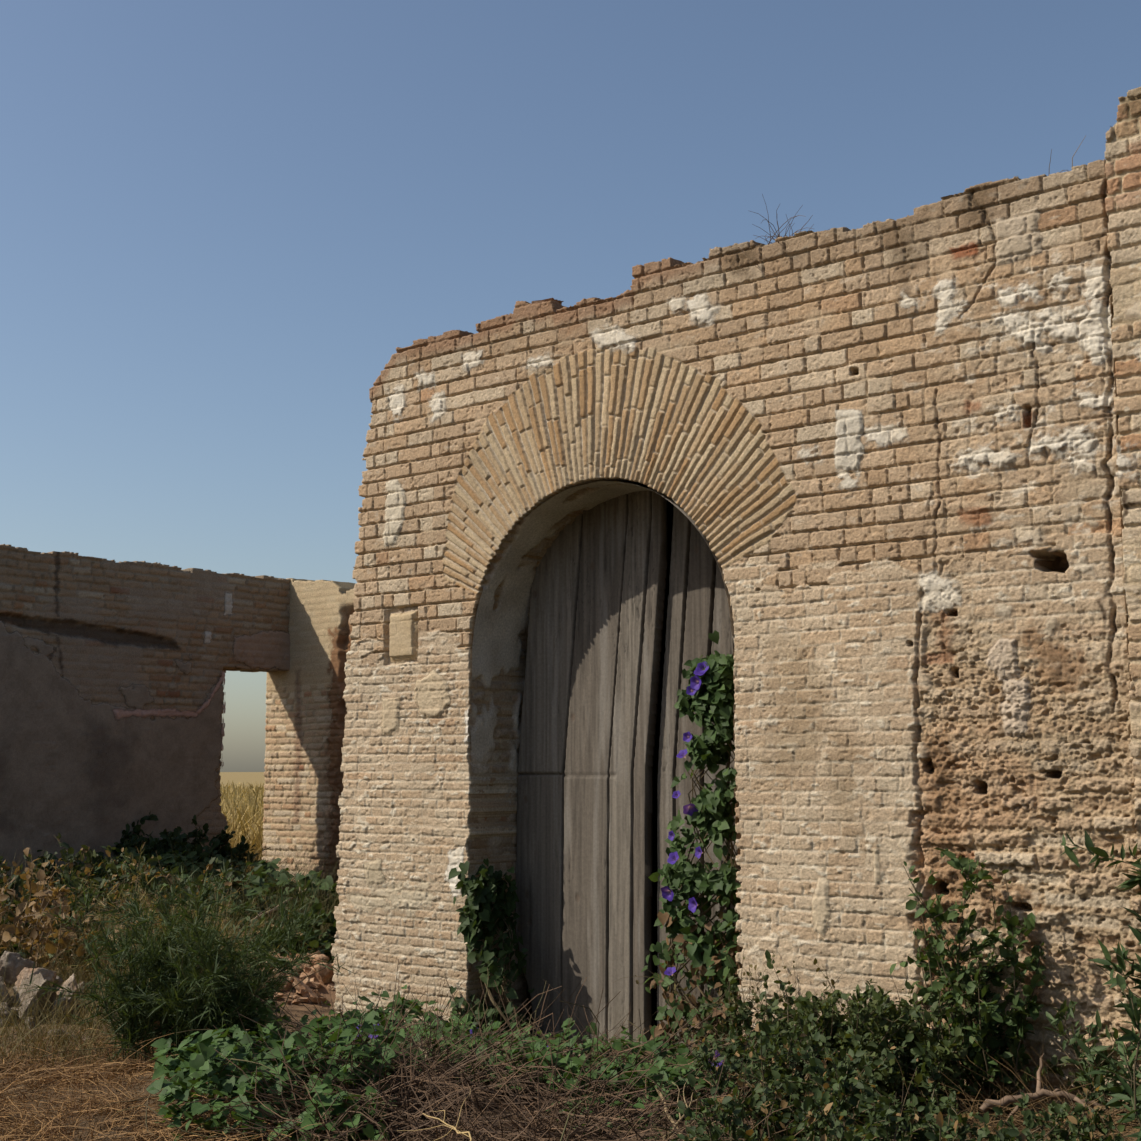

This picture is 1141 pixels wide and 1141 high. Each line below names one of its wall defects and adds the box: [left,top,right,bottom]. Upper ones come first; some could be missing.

crack [1091,183,1113,307]
peeling [1011,522,1045,547]
crack [1098,336,1140,696]
peeling [918,570,961,612]
peeling [1071,559,1094,576]
flaking render [233,630,290,671]
peeling [999,677,1031,736]
flaking render [0,621,224,879]
spalling [444,846,464,897]